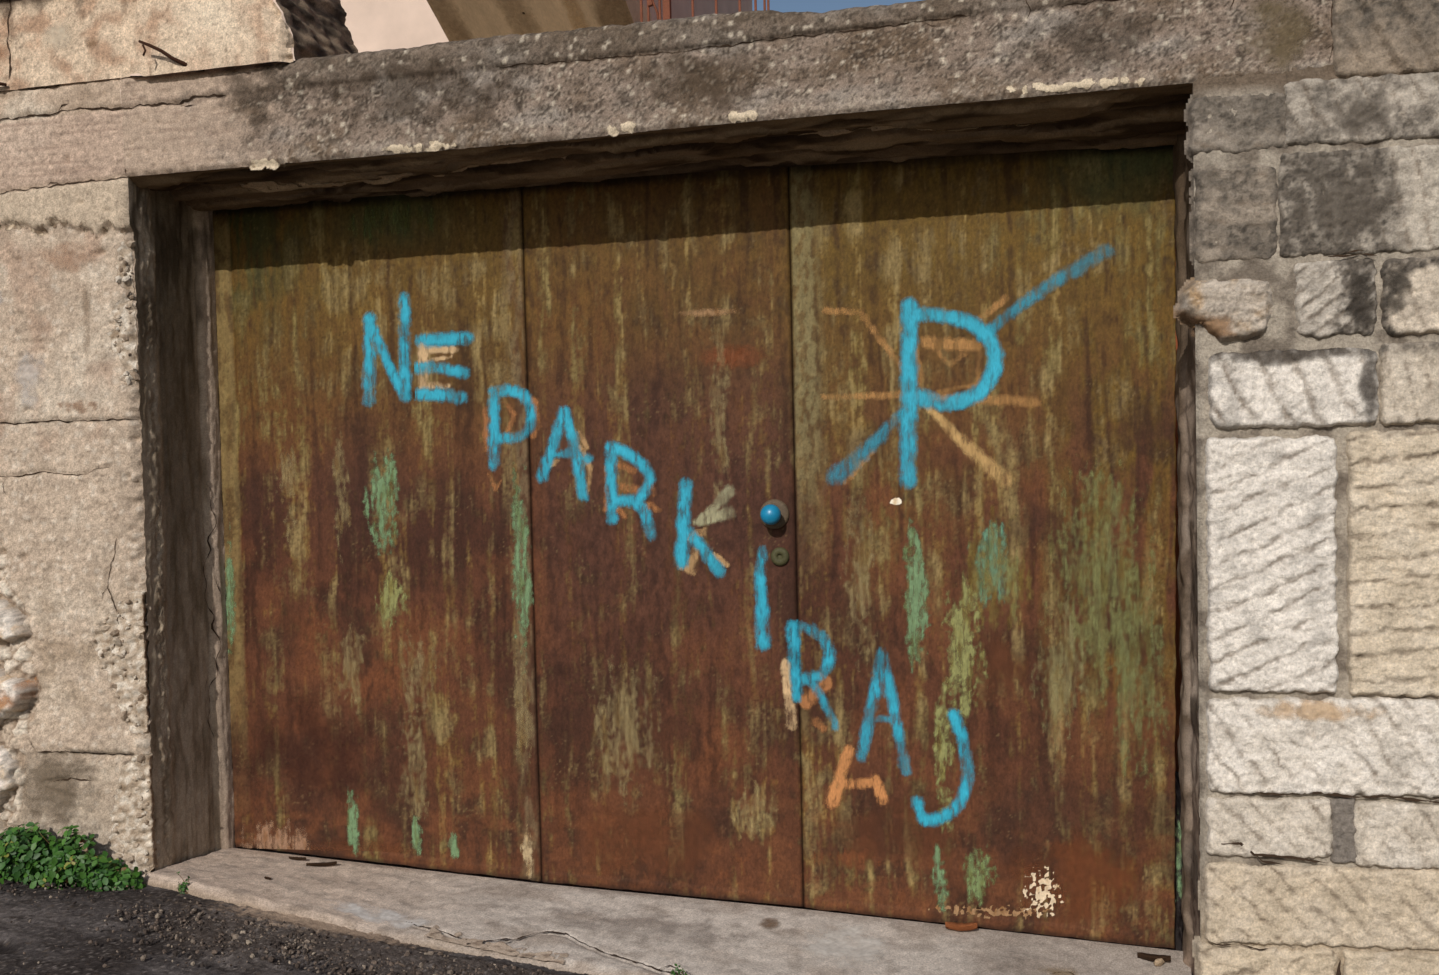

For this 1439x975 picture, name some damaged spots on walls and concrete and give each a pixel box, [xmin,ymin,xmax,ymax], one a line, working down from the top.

crack [0,0,225,121]
crack [102,538,124,646]